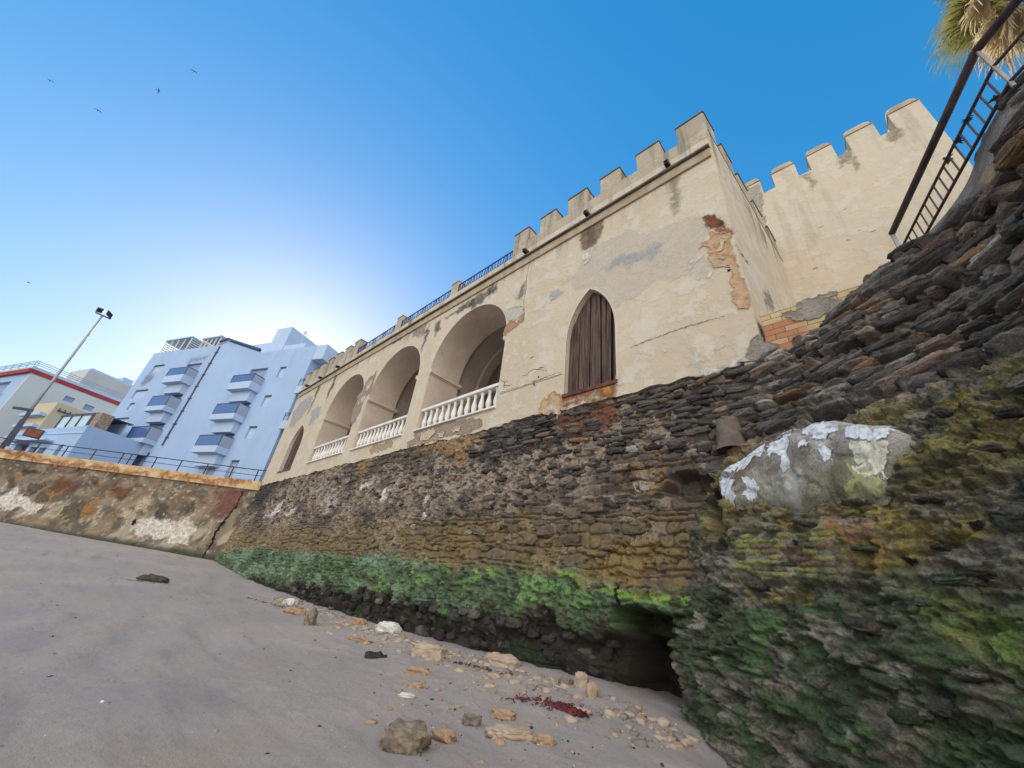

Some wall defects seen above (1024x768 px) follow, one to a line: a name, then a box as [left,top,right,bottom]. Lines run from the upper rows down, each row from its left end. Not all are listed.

damp [579,220,604,250]
spalling [700,231,751,309]
flaking render [503,306,525,336]
crack [631,316,724,348]
spalling [781,290,842,321]
spalling [538,391,564,418]